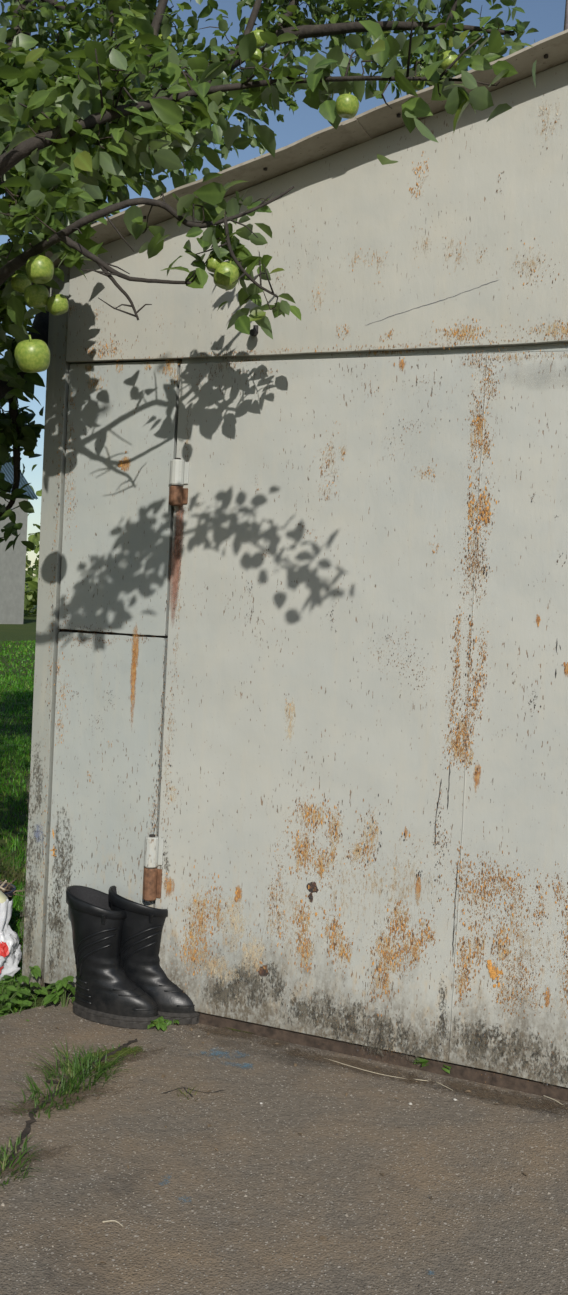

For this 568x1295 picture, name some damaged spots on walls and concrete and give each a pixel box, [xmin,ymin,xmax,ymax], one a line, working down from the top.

corrosion [44,567,153,747]
corrosion [65,302,568,1043]
water stain [205,958,568,1096]